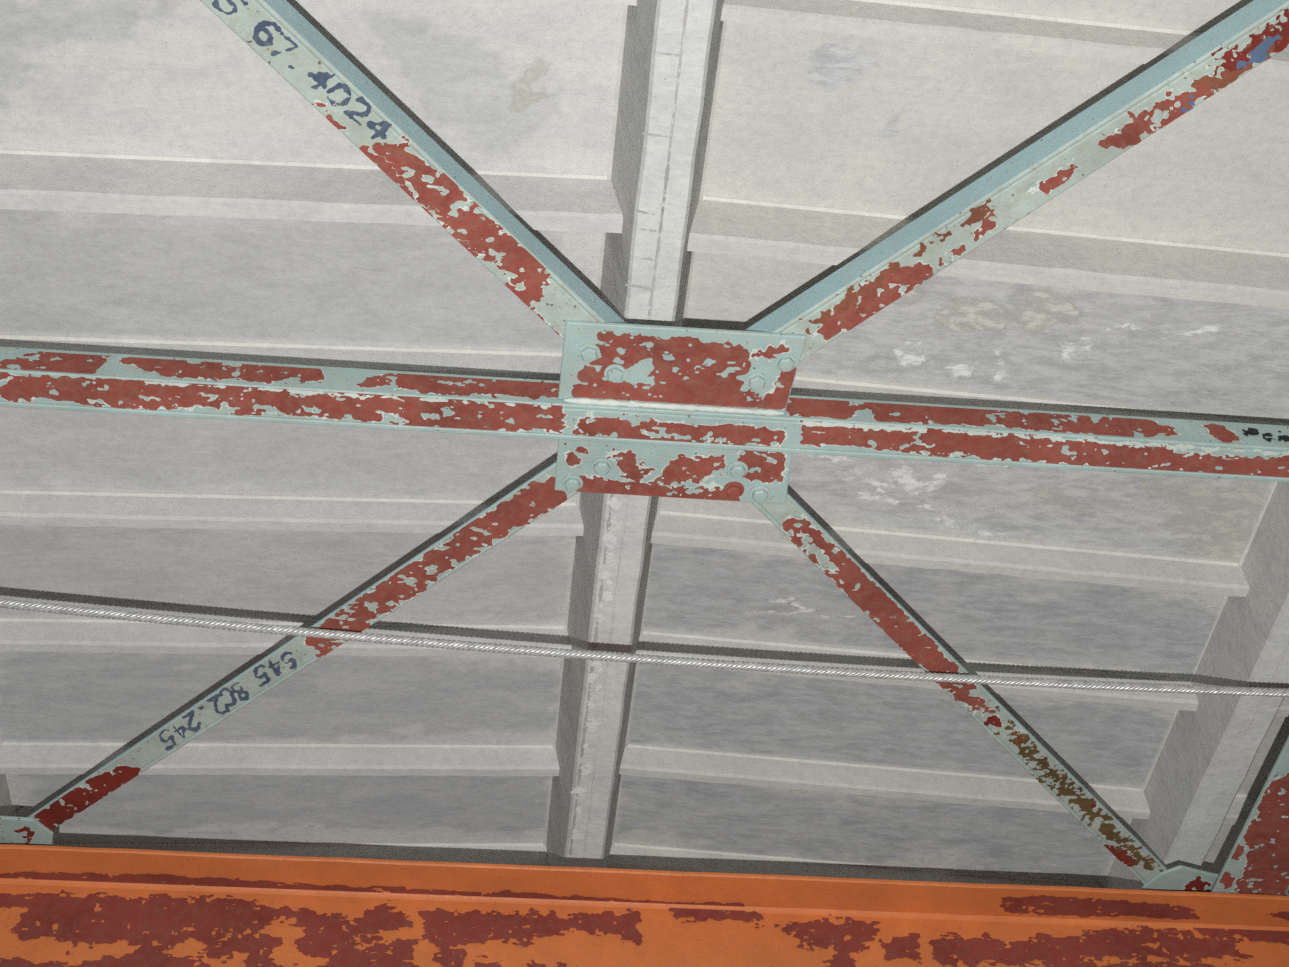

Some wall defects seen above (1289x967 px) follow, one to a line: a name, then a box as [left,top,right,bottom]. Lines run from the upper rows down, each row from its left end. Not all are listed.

peeling [1098,8,1289,149]
peeling [312,100,563,338]
peeling [799,198,1001,342]
peeling [935,290,1142,361]
peeling [1026,158,1079,195]
peeling [1172,323,1223,336]
peeling [0,331,1289,658]
peeling [781,513,1029,745]
peeling [0,764,1289,967]
rust [987,700,1163,873]